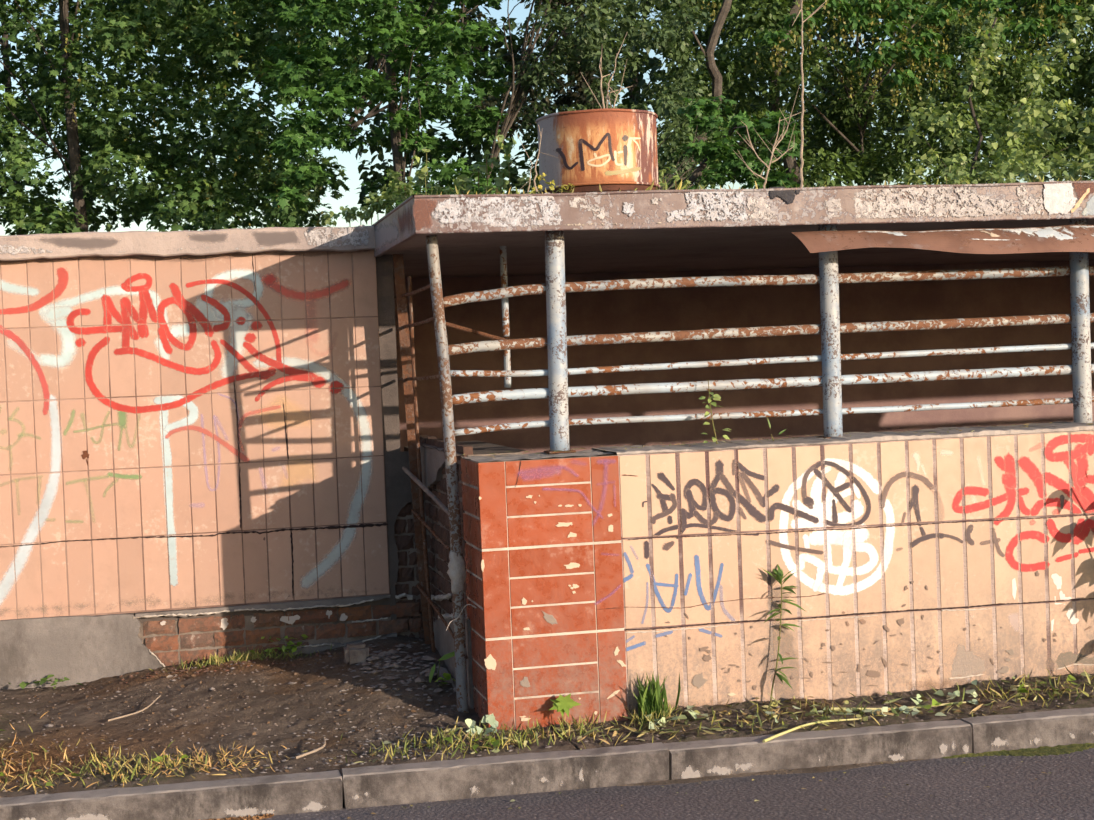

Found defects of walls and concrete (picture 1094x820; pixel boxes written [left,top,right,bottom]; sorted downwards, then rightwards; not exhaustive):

peeling [432,192,645,228]
peeling [652,188,777,224]
peeling [824,179,1094,219]
crack [0,382,388,594]
flaking render [133,435,473,667]
peeling [484,654,497,670]